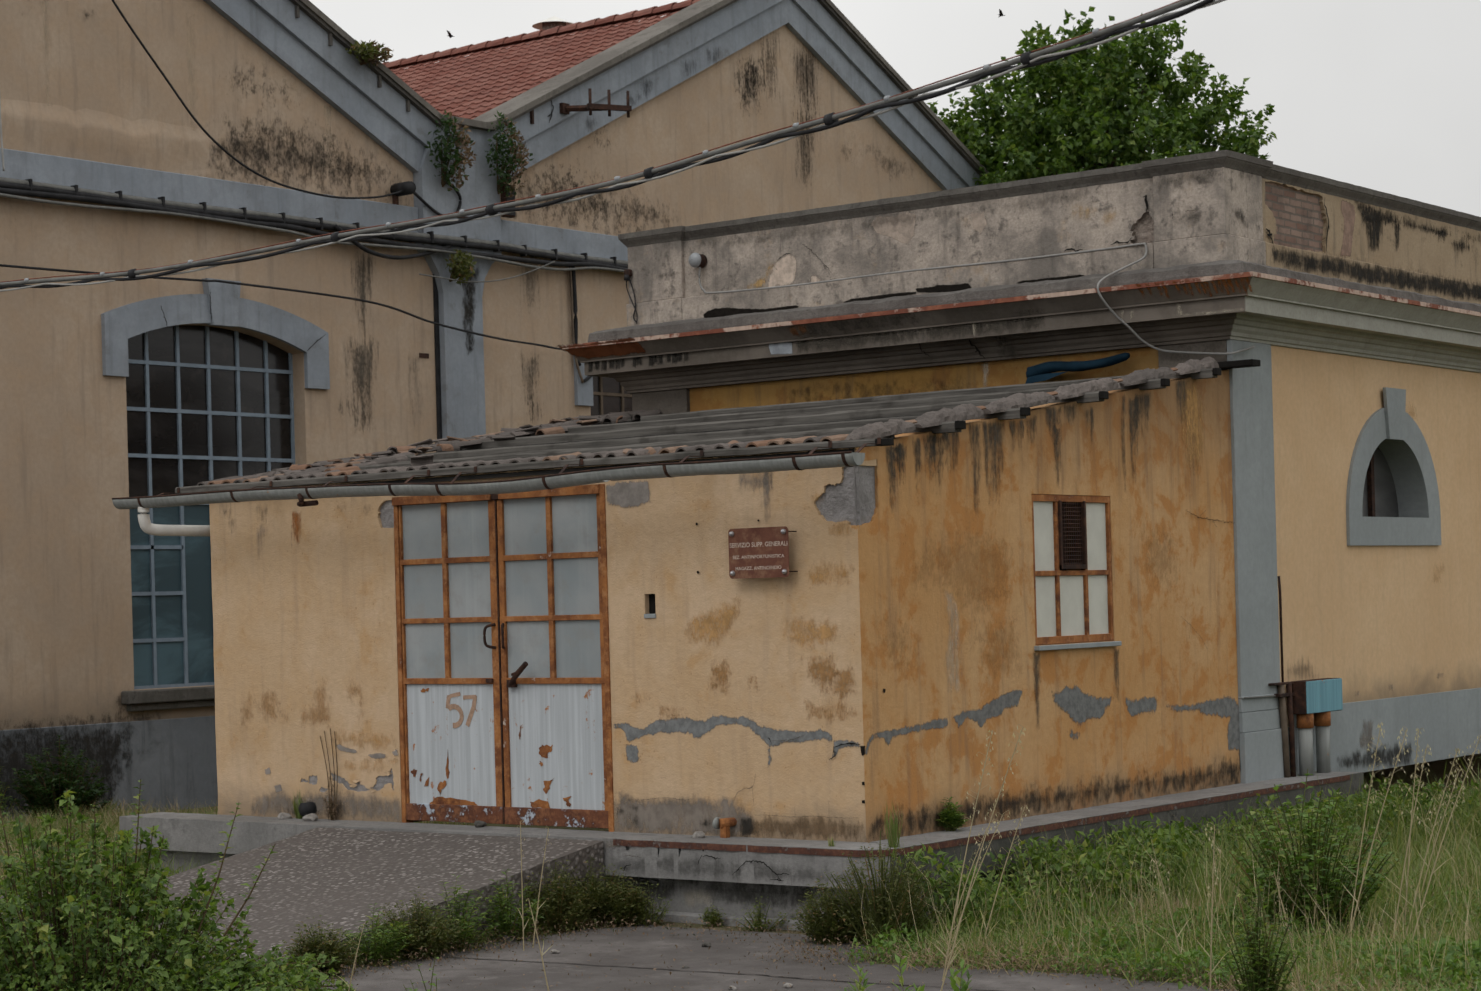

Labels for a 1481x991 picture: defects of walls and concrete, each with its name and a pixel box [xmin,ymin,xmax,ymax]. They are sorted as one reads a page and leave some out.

leakage [742,40,776,103]
leakage [794,54,815,175]
leakage [213,128,370,193]
crack [1065,195,1194,252]
leakage [1273,201,1481,300]
leakage [351,345,372,426]
leakage [886,406,1093,494]
leakage [1123,395,1149,471]
spalling [815,466,876,534]
peeling [301,769,394,793]
corrosion [411,756,477,805]
corrosion [530,745,571,808]